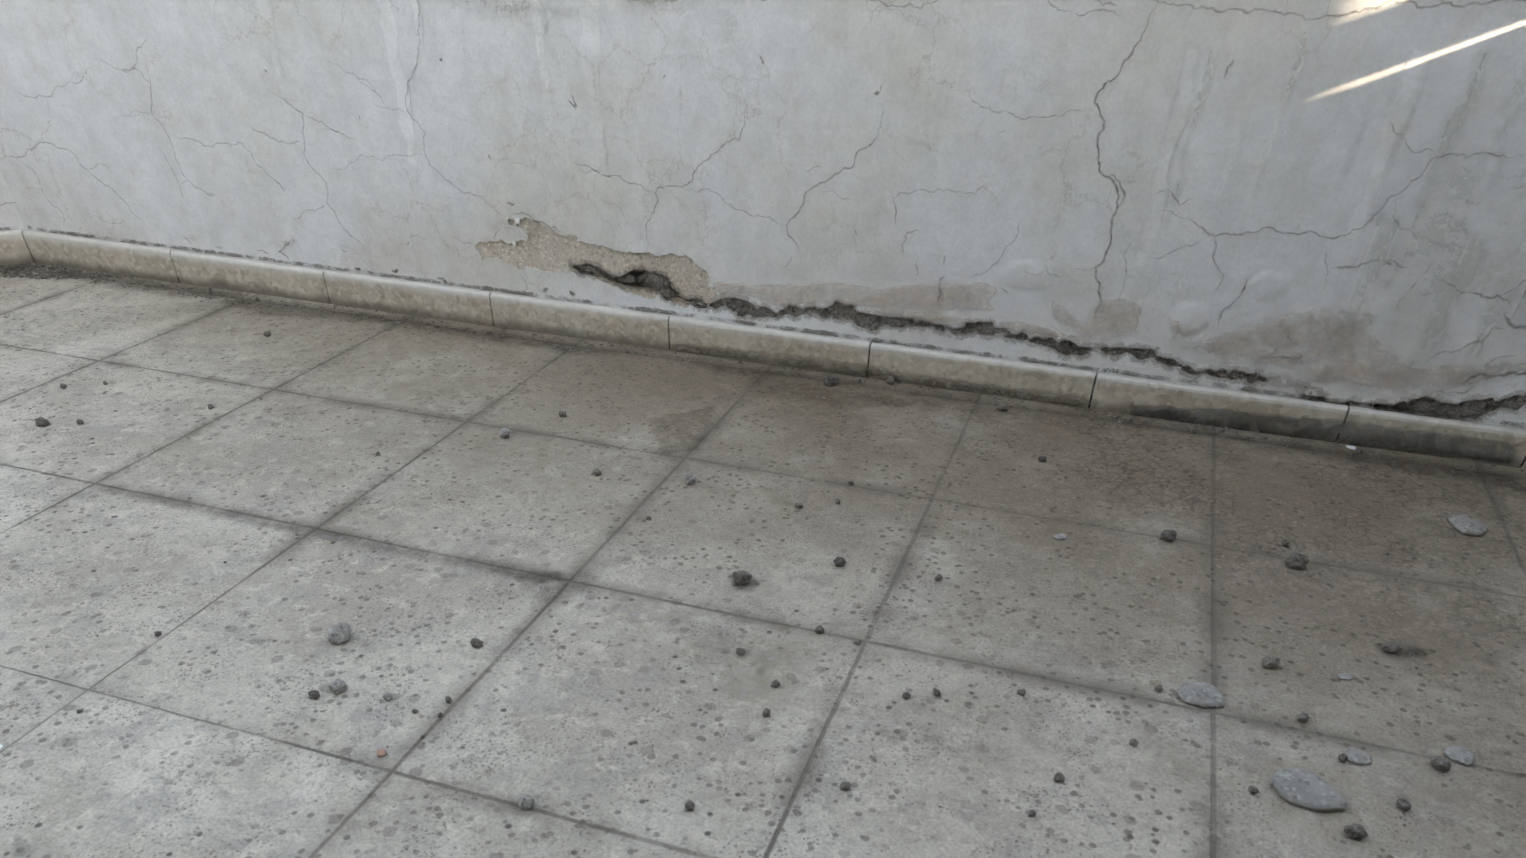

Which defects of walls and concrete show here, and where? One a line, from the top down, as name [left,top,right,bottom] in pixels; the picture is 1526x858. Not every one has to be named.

crack [1094,41,1140,312]
spalling [475,217,1526,421]
crack [1439,281,1526,378]